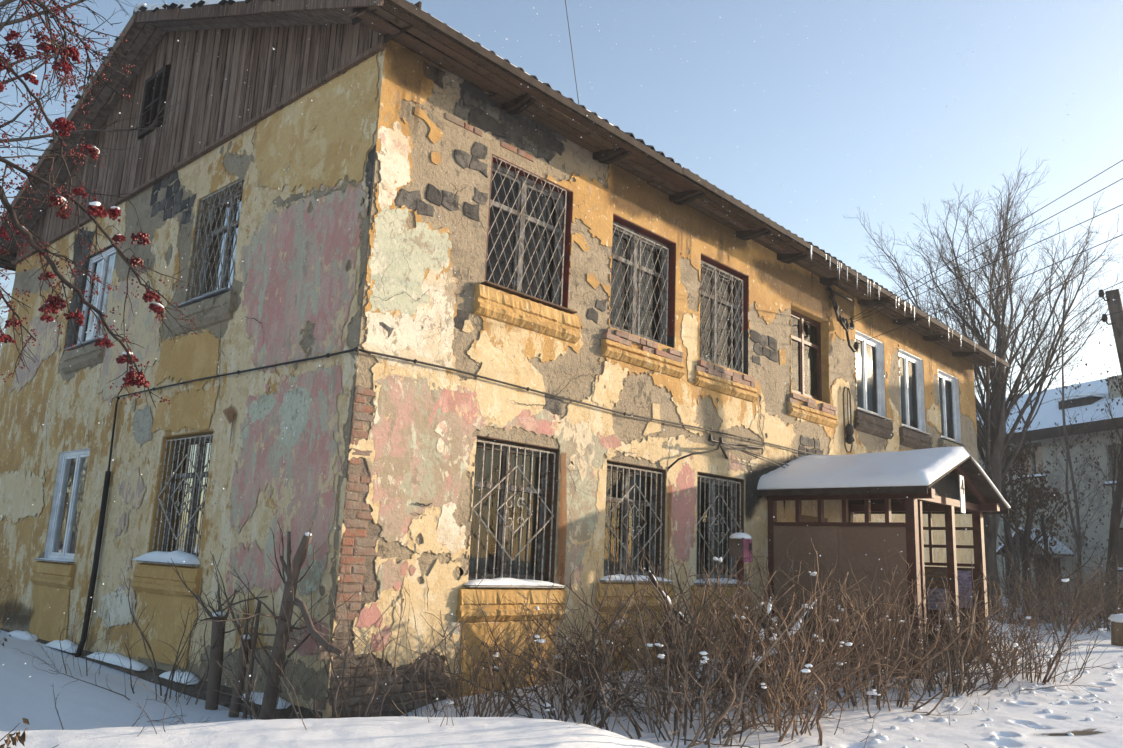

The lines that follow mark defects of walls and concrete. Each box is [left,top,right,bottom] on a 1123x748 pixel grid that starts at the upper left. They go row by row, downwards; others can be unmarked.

flaking render [8,51,916,718]
peeling [0,469,45,524]
flaking render [3,617,31,632]